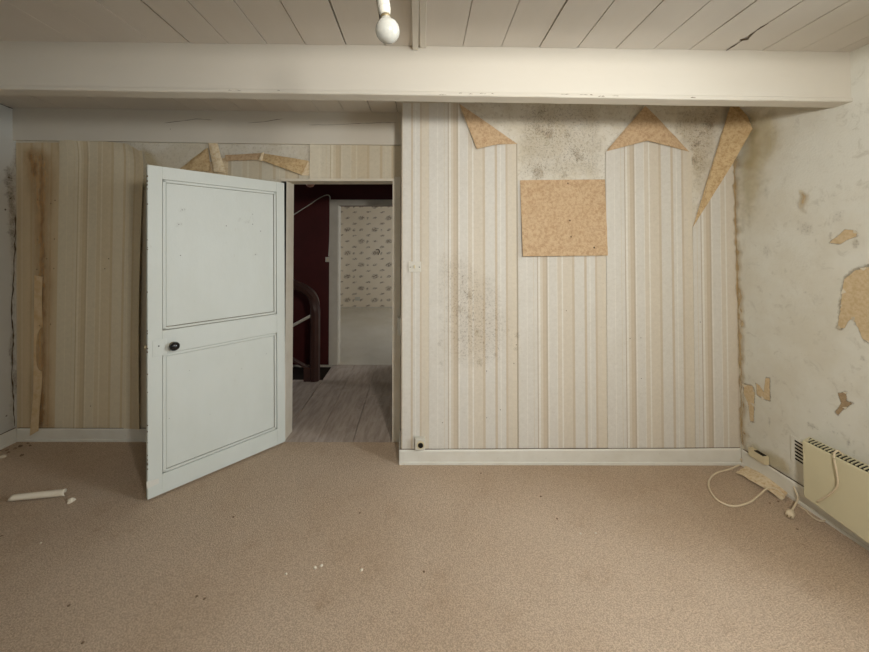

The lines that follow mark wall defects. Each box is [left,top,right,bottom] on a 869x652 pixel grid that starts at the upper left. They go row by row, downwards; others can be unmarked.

peeling [830,229,859,244]
peeling [836,267,869,343]
peeling [742,378,770,421]
peeling [836,392,852,414]